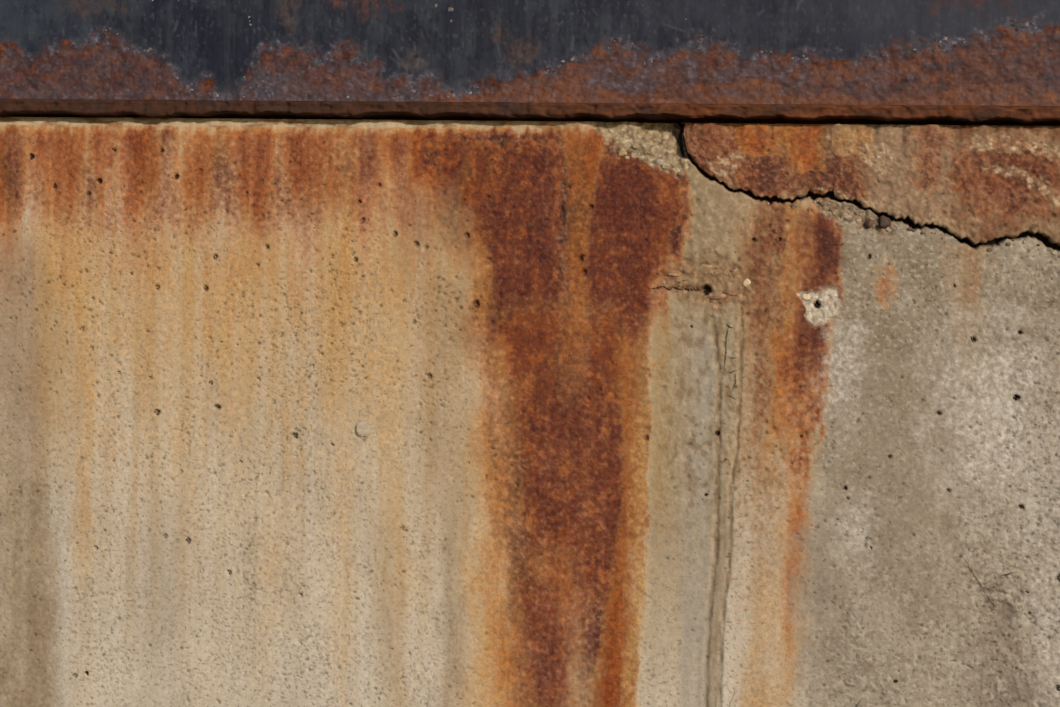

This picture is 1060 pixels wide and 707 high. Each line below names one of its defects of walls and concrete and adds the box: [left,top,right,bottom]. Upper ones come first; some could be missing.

corrosion [0,0,1060,106]
crack [675,119,1060,258]
spalling [795,284,844,330]
corrosion [0,123,874,707]